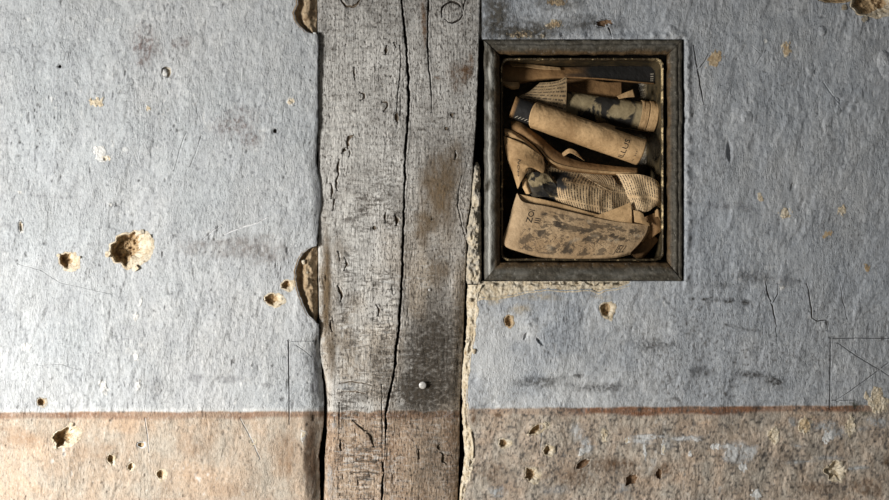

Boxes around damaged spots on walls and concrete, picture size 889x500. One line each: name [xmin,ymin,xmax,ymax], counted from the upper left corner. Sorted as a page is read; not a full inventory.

flaking render [292,0,317,35]
hole [820,0,889,22]
hole [56,252,80,272]
hole [105,229,155,271]
crack [379,0,434,500]
flaking render [264,247,318,322]
crack [763,279,780,336]
crack [805,282,849,330]
flaking render [459,162,631,500]
peeling [864,386,889,414]
hole [51,422,83,450]
hole [823,460,847,483]